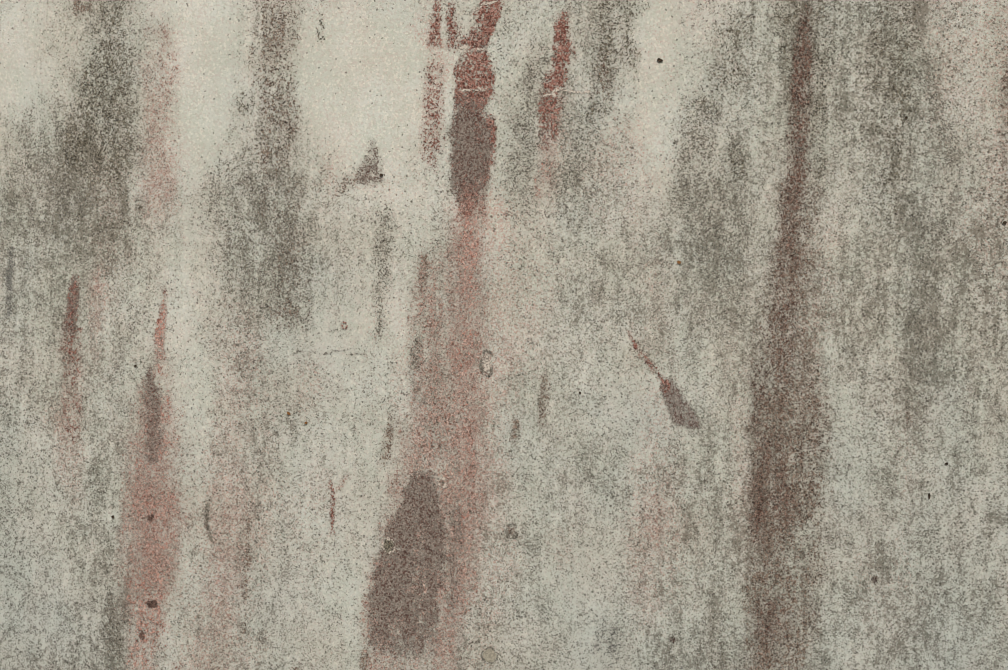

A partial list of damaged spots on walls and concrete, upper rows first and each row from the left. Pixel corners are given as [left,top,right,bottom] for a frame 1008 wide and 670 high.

water stain [1,0,144,319]
water stain [200,0,321,335]
water stain [332,142,385,197]
rust [534,2,576,198]
rust [58,275,102,443]
rust [114,288,196,670]
rust [359,0,504,670]
rust [626,330,700,429]
rust [739,4,838,670]